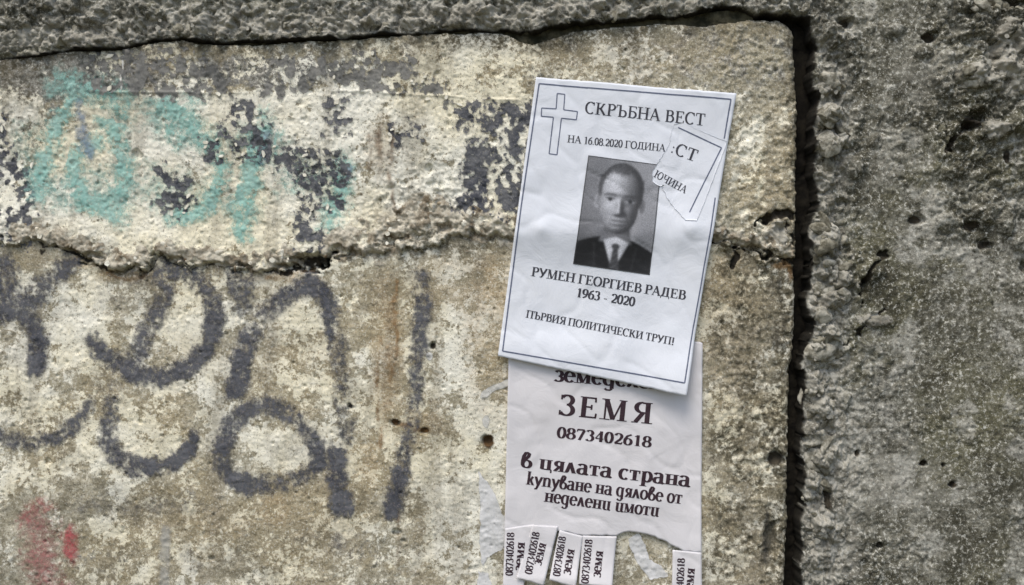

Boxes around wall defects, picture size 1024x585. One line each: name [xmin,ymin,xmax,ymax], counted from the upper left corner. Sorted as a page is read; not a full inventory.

crack [151,35,399,46]
crack [438,11,753,45]
crack [38,241,108,271]
crack [264,251,338,276]
crack [711,22,811,585]